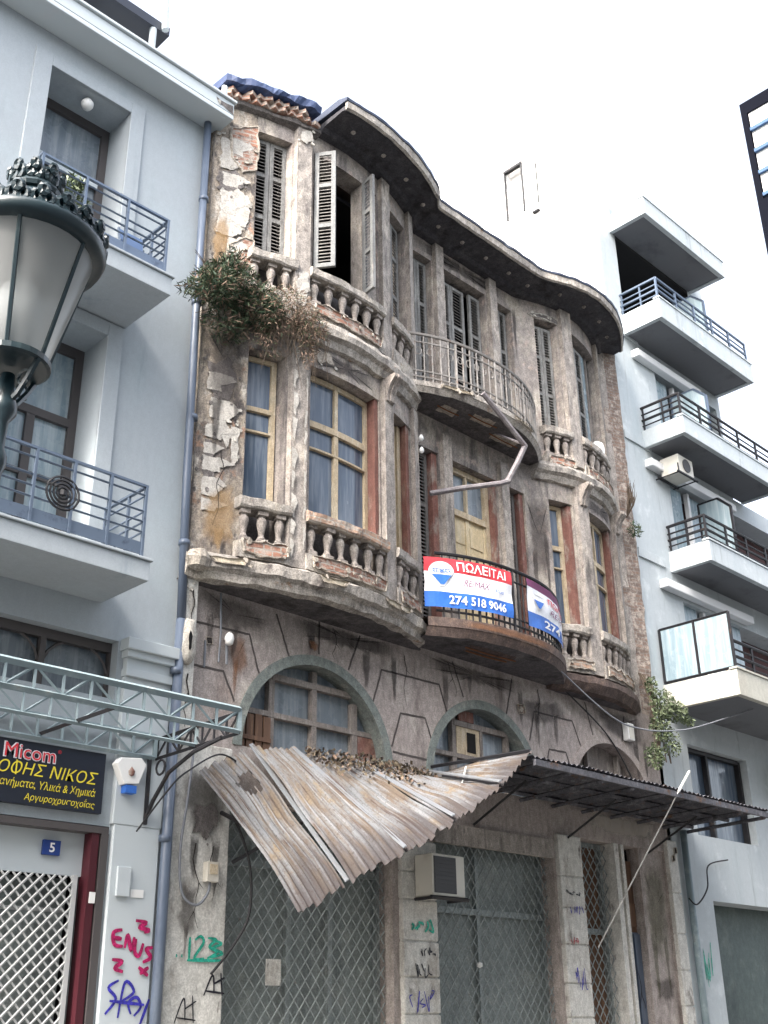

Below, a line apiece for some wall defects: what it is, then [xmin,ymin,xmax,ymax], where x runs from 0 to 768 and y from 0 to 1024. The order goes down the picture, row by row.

peeling [215,96,261,271]
spalling [297,271,383,348]
peeling [195,356,243,512]
spalling [210,346,422,614]